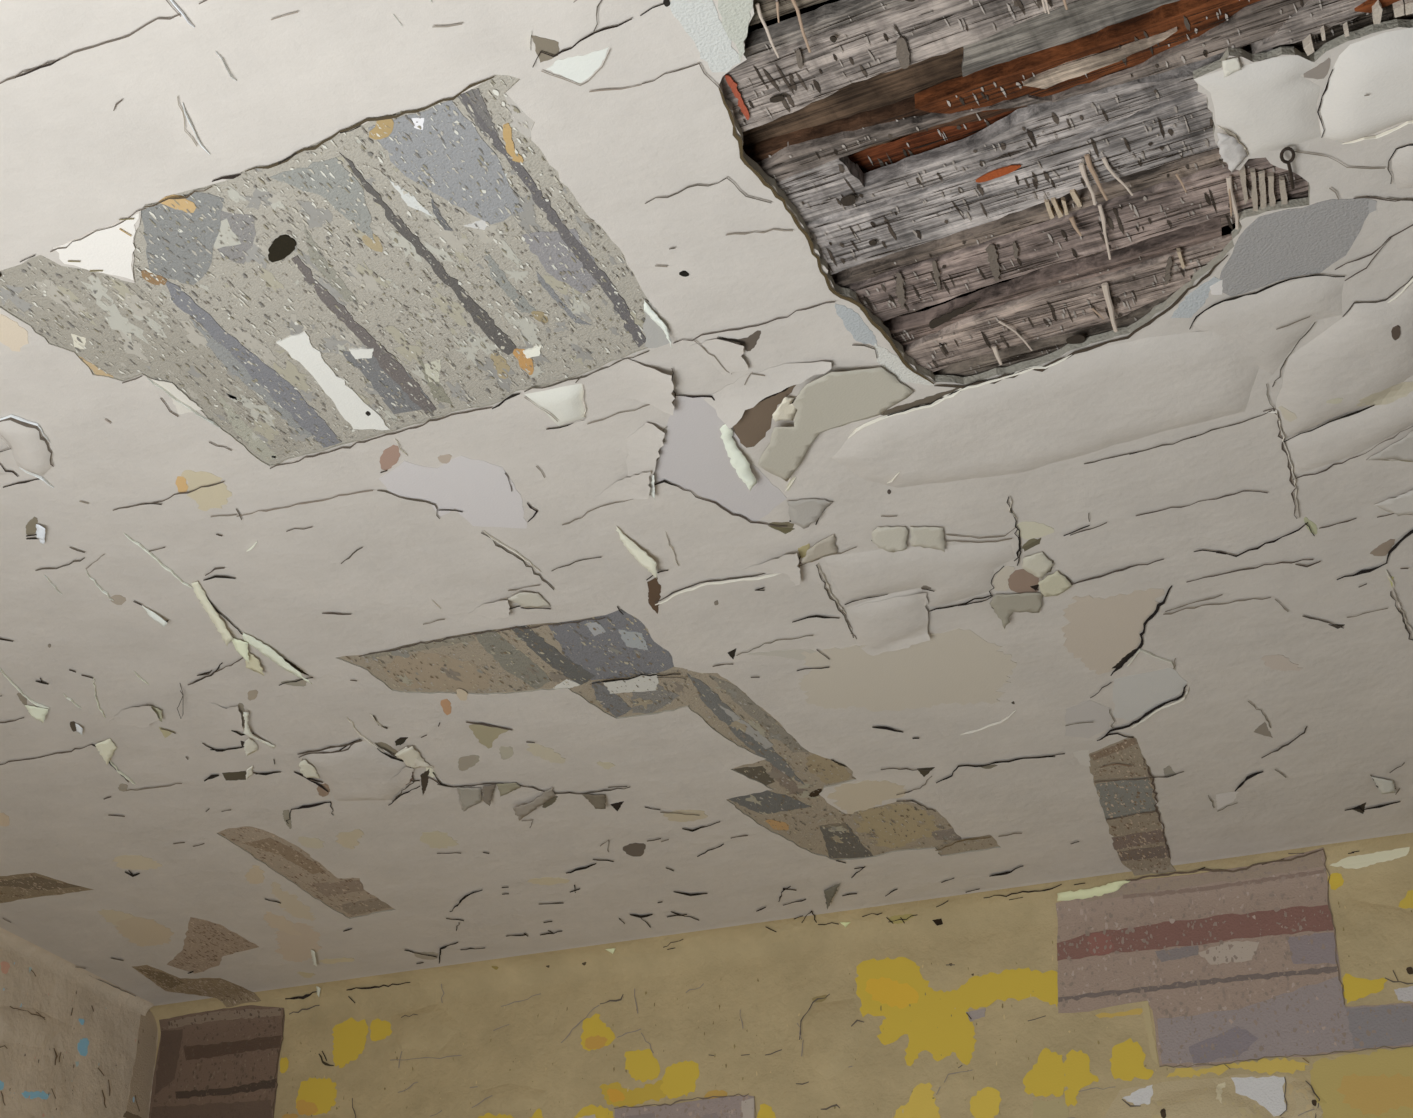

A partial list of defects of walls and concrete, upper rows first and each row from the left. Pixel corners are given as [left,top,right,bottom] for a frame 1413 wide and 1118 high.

spalling [670,0,753,72]
crack [20,76,495,272]
peeling [1217,126,1248,172]
spalling [84,75,1085,656]
crack [0,418,54,488]
crack [26,534,105,571]
crack [270,0,1413,1005]
spalling [338,592,999,860]
spalling [855,848,1413,1118]
spalling [126,1005,289,1118]
peeling [296,1017,392,1115]
peeling [574,1013,727,1118]